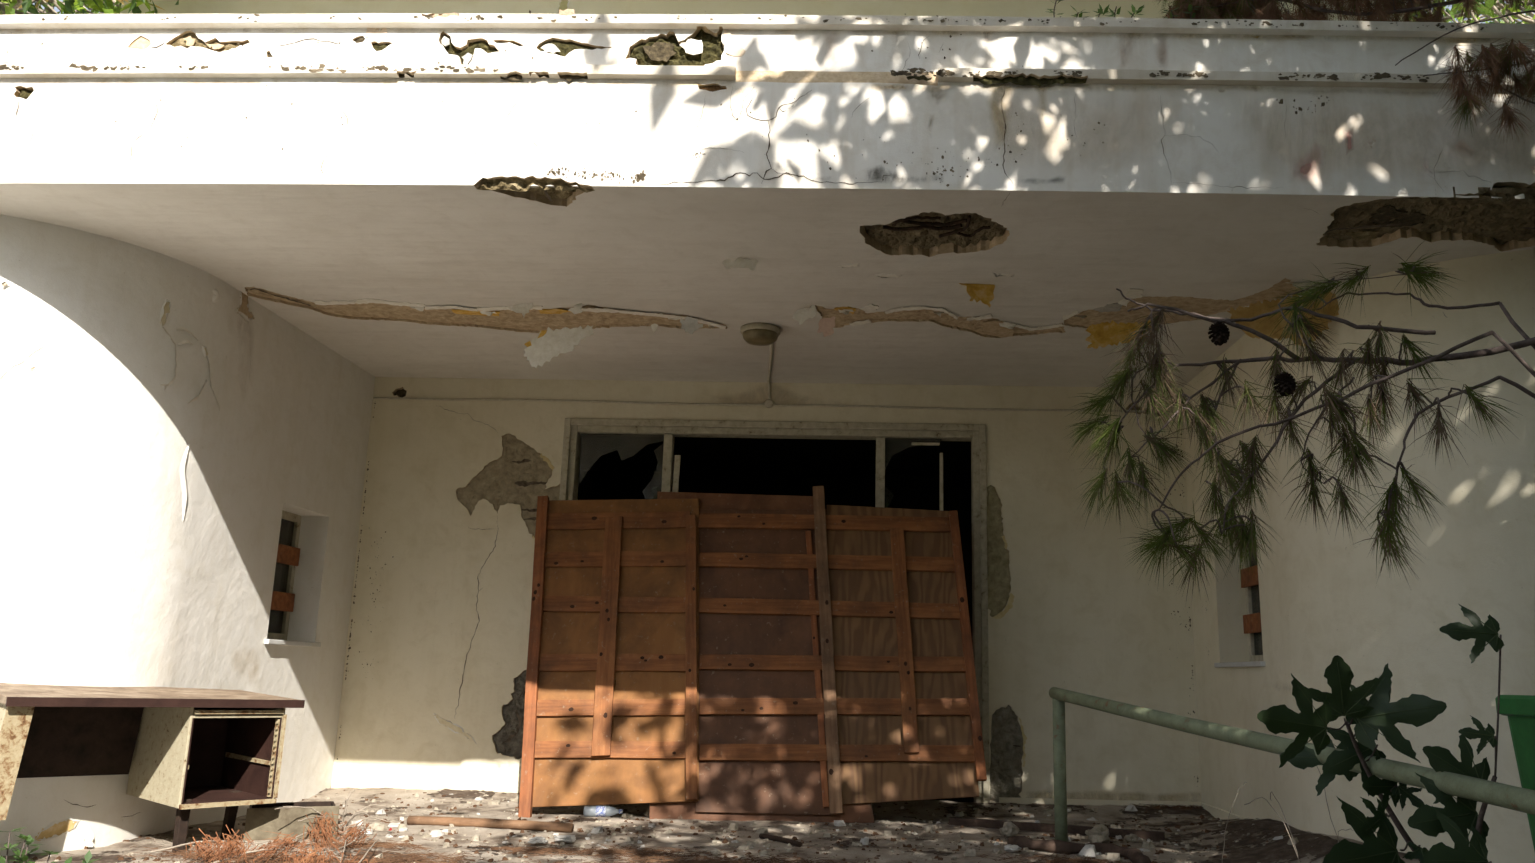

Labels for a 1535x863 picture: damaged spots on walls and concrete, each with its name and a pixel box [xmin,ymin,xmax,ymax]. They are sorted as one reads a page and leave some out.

spalling [129,33,250,52]
spalling [422,12,596,65]
spalling [629,29,746,66]
spalling [500,74,588,82]
crack [657,87,890,184]
crack [1001,90,1012,202]
spalling [477,178,595,202]
spalling [864,212,1006,249]
spalling [1323,186,1535,245]
spalling [457,434,560,541]
crack [455,525,498,715]
spalling [433,670,527,759]